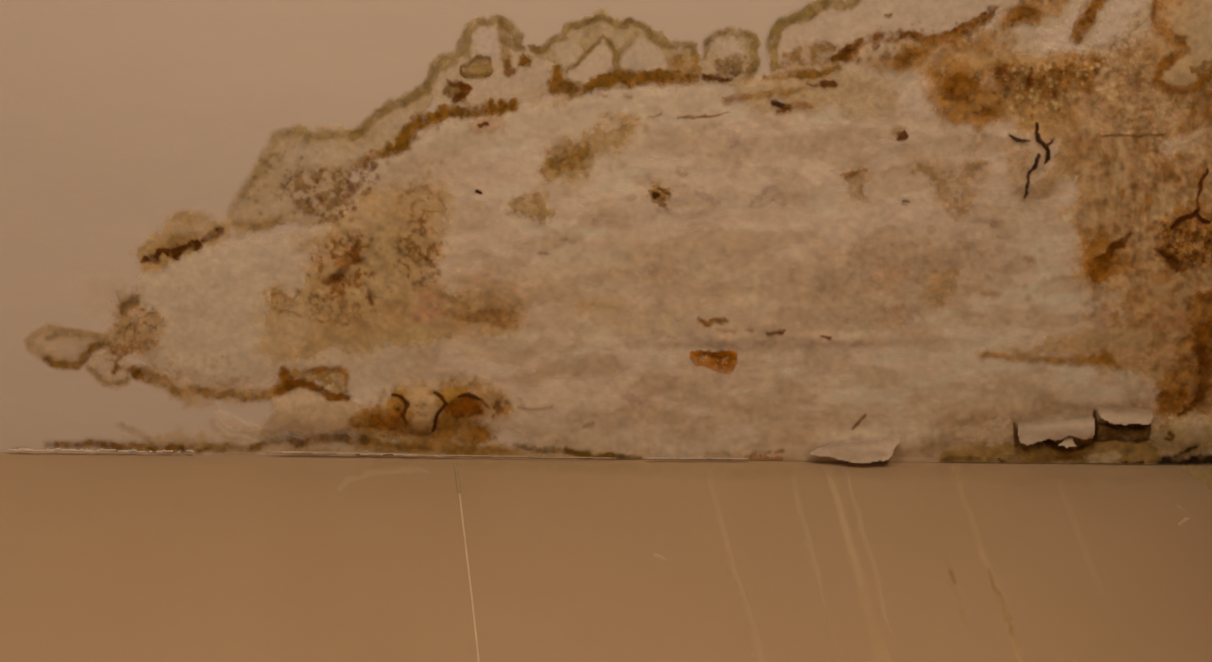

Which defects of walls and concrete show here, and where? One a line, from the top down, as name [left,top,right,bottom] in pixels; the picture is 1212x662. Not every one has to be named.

crack [1009,123,1053,198]
peeling [133,0,1212,465]
damp [231,0,1212,435]
crack [1171,169,1211,229]
damp [43,291,166,386]
damp [55,431,642,459]
damp [921,415,1109,463]
damp [1149,454,1212,470]